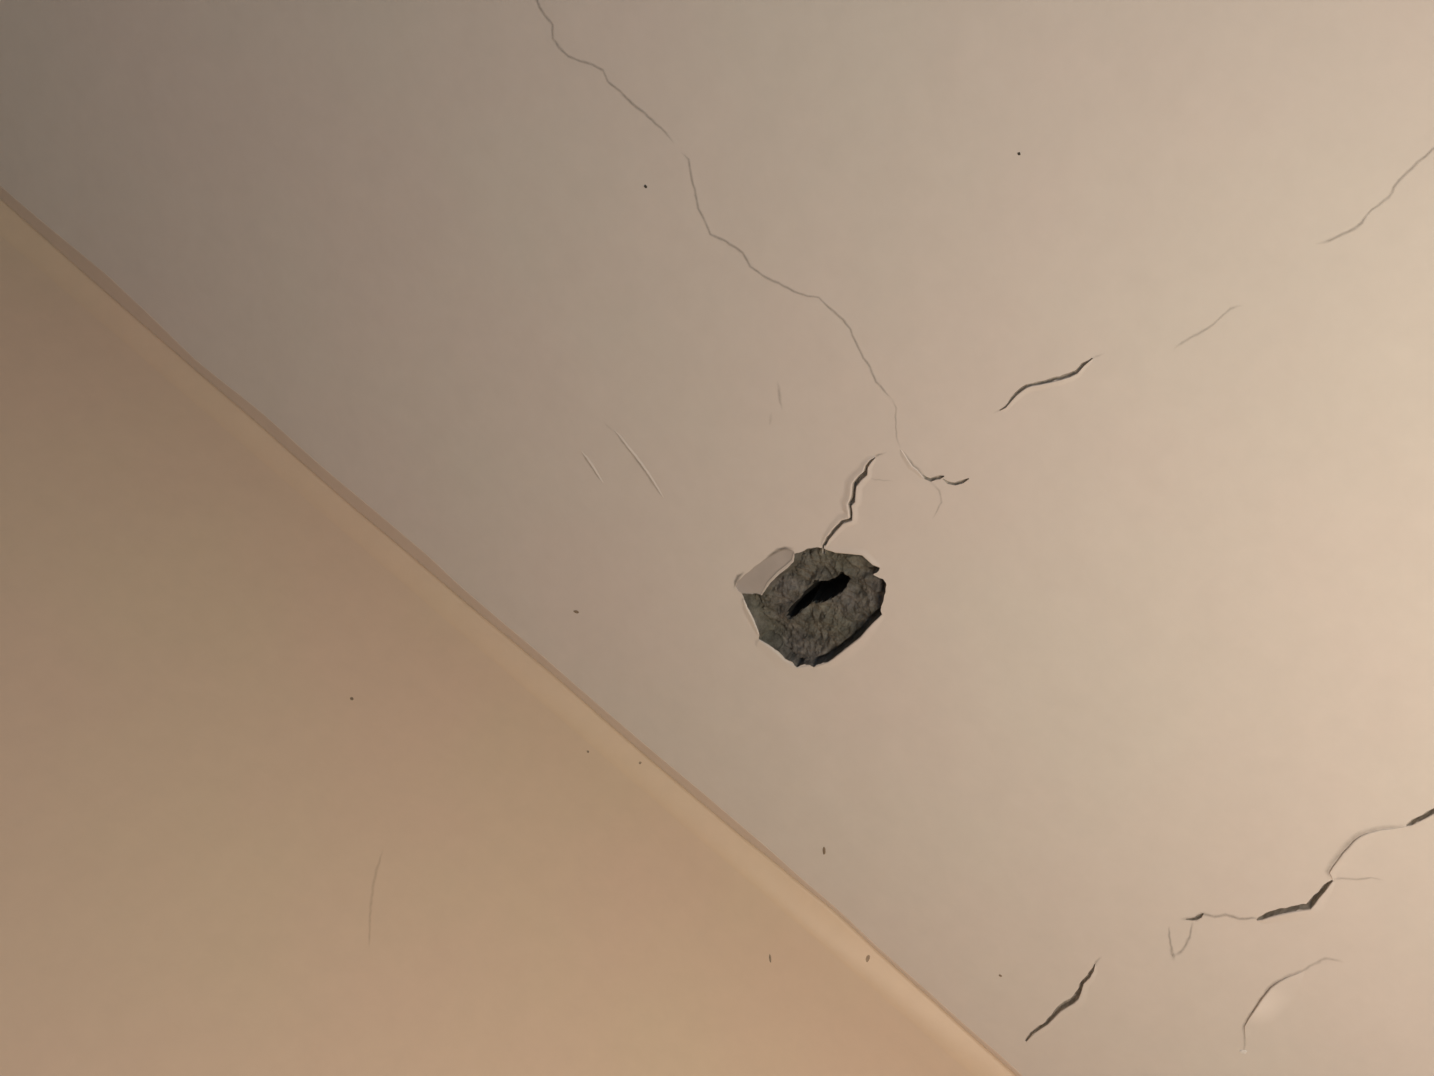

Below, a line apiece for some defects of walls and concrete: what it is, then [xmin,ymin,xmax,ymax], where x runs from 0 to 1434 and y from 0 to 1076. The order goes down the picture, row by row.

crack [1000,358,1094,412]
crack [821,450,969,555]
flaking render [736,545,886,679]
crack [1186,912,1204,920]
crack [1256,808,1434,924]
crack [1025,964,1098,1042]